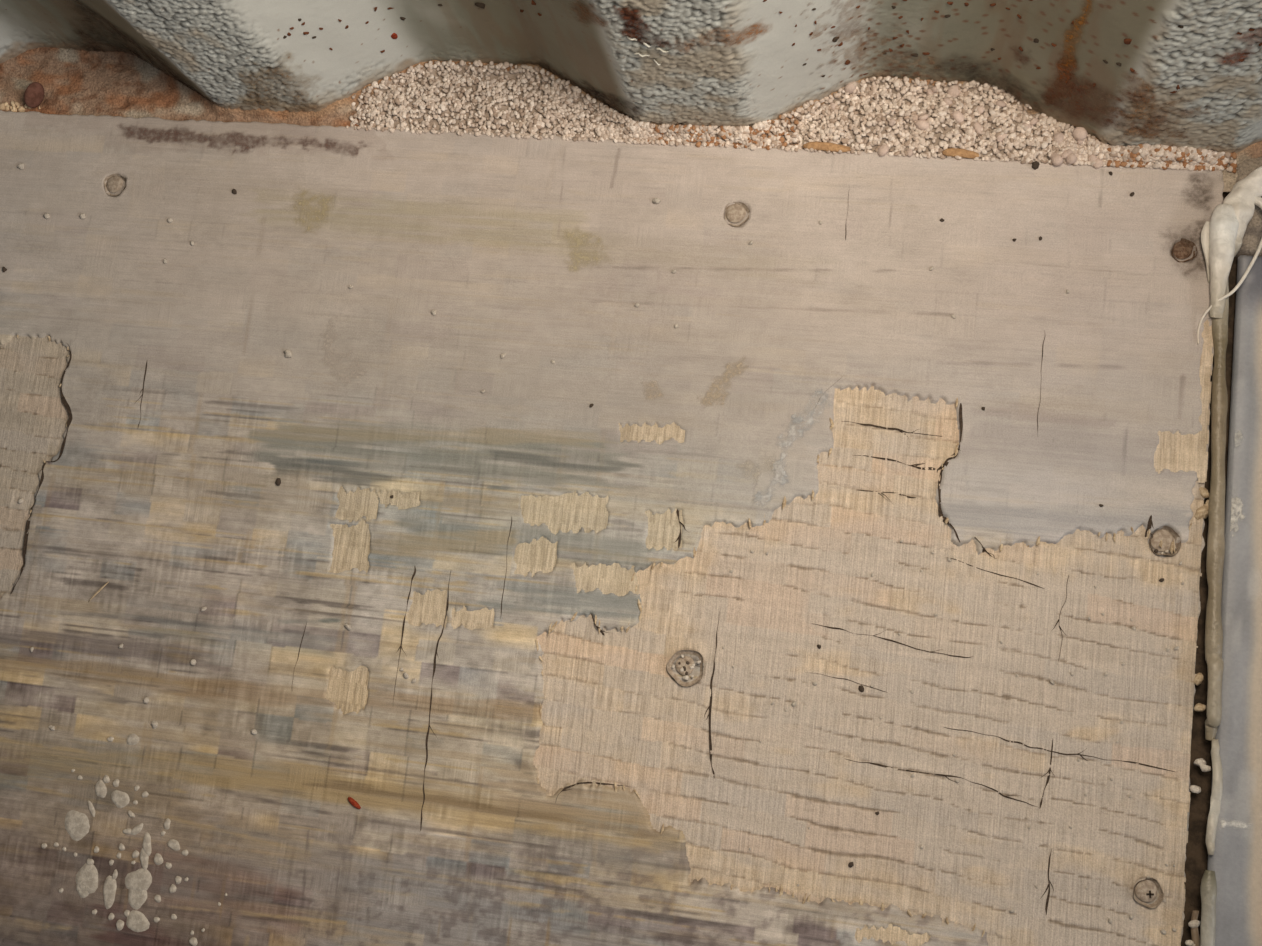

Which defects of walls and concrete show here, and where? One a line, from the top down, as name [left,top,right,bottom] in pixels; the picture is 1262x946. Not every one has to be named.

rust [0,82,44,112]
rust [1103,60,1186,139]
peeling [0,335,70,599]
peeling [378,489,420,509]
peeling [514,491,608,577]
peeling [406,589,495,630]
peeling [533,319,1214,946]
peeling [325,666,369,715]
crack [393,567,451,831]
crack [704,612,720,779]
crack [1040,850,1054,915]